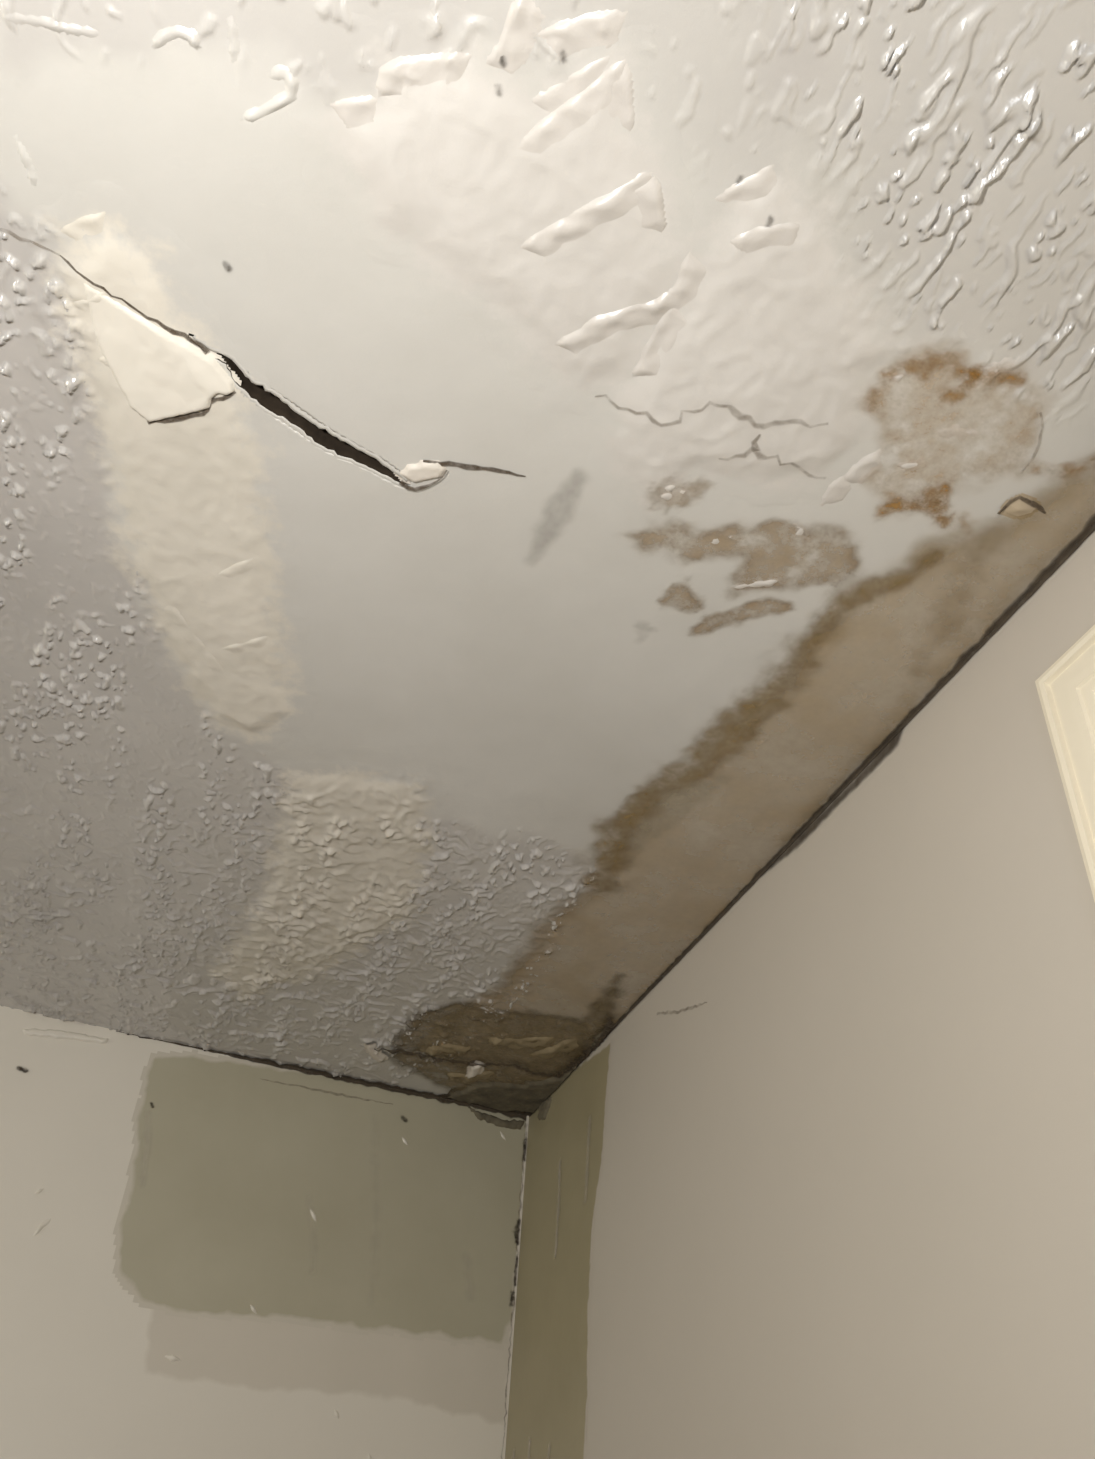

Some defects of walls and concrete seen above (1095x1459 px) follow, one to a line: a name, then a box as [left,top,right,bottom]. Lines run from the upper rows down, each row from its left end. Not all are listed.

crack [60,255,526,491]
crack [22,516,1095,1159]
water stain [364,481,1095,1113]
crack [510,1220,521,1305]